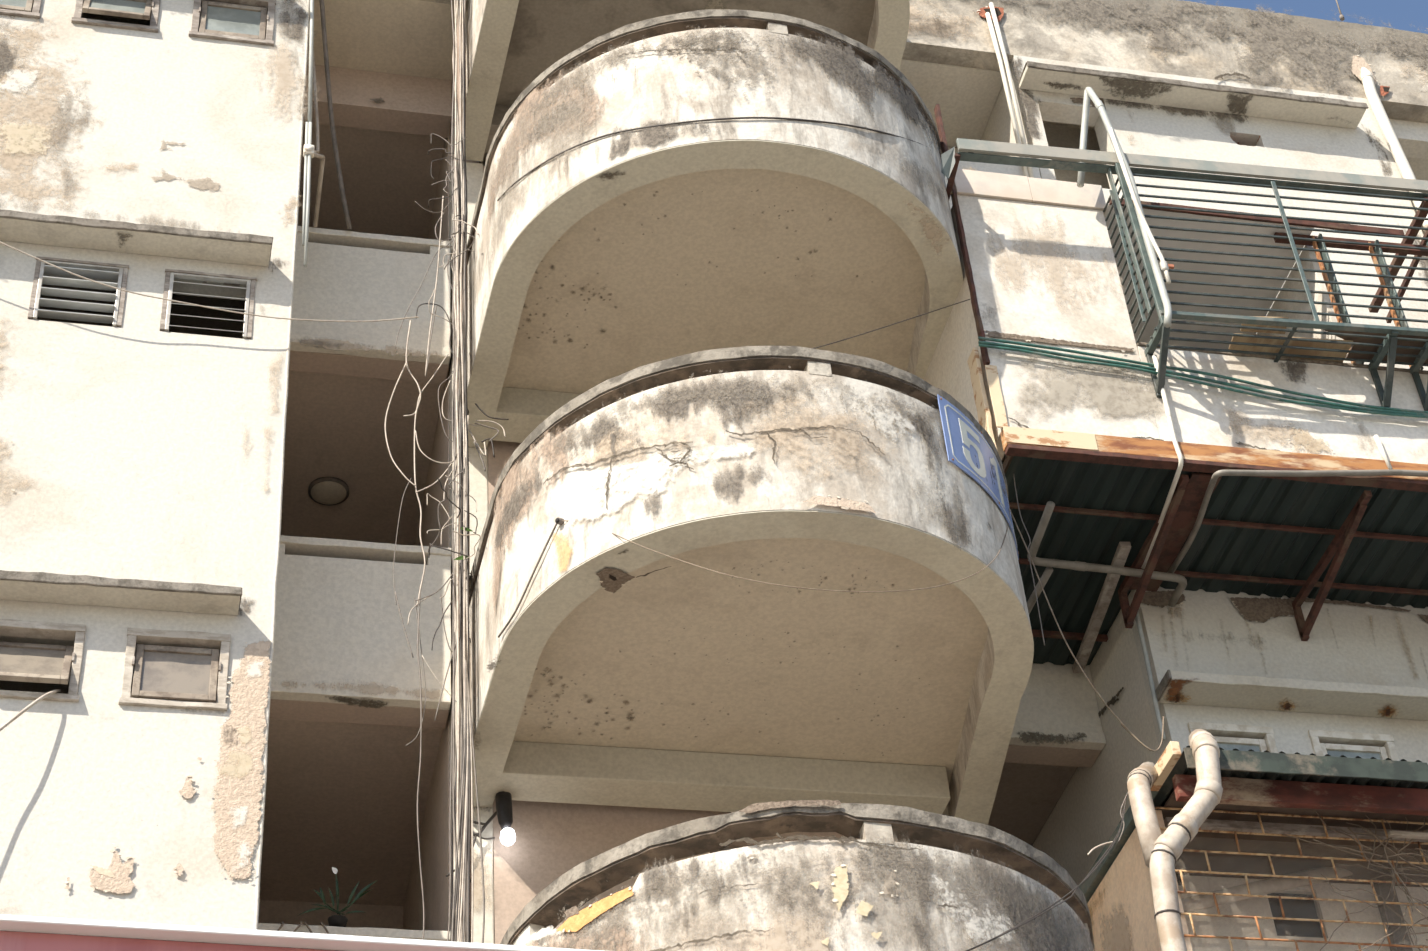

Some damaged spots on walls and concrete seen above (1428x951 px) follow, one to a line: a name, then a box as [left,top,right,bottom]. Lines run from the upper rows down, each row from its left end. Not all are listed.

damp [908,6,969,36]
damp [982,0,1428,138]
damp [488,26,944,228]
crack [726,425,885,464]
crack [543,441,694,509]
damp [493,371,971,611]
spalling [596,568,635,594]
spalling [1230,597,1295,623]
flaking render [179,638,272,881]
flaking render [89,842,135,894]
flaking render [810,864,899,916]